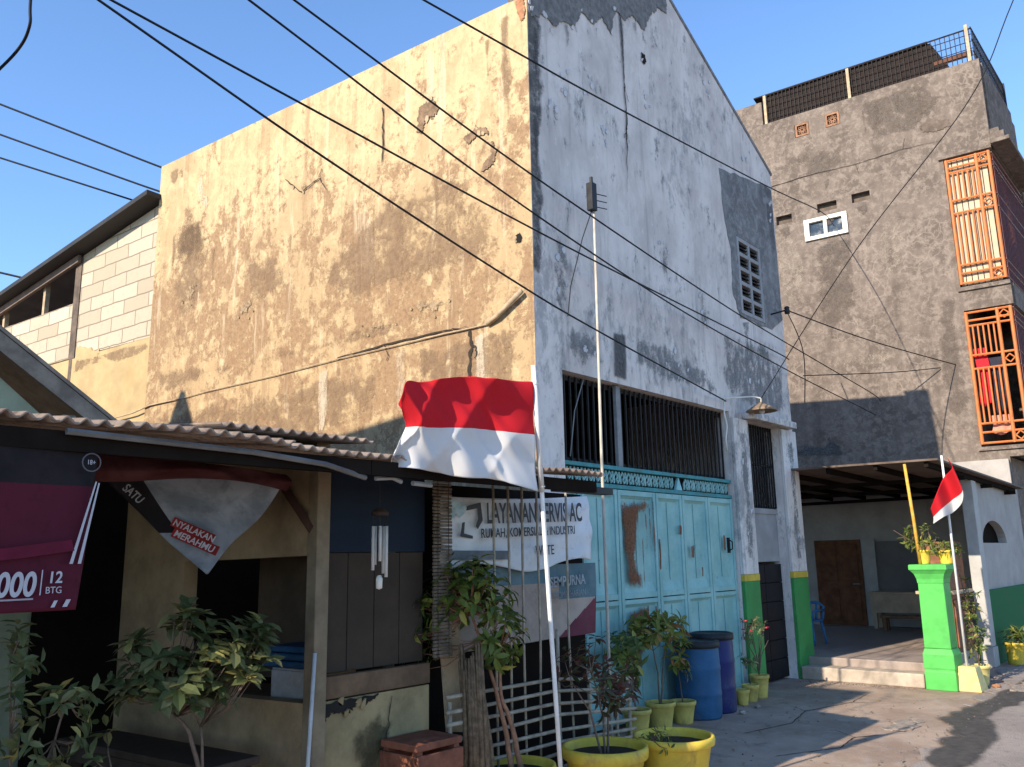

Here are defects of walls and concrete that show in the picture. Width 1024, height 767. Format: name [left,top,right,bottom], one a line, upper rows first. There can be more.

peeling [514,0,667,41]
spalling [416,96,439,134]
spalling [463,125,498,171]
water stain [528,10,543,271]
crack [621,54,629,192]
crack [285,166,327,192]
rust [621,501,661,586]
spalling [325,693,379,722]